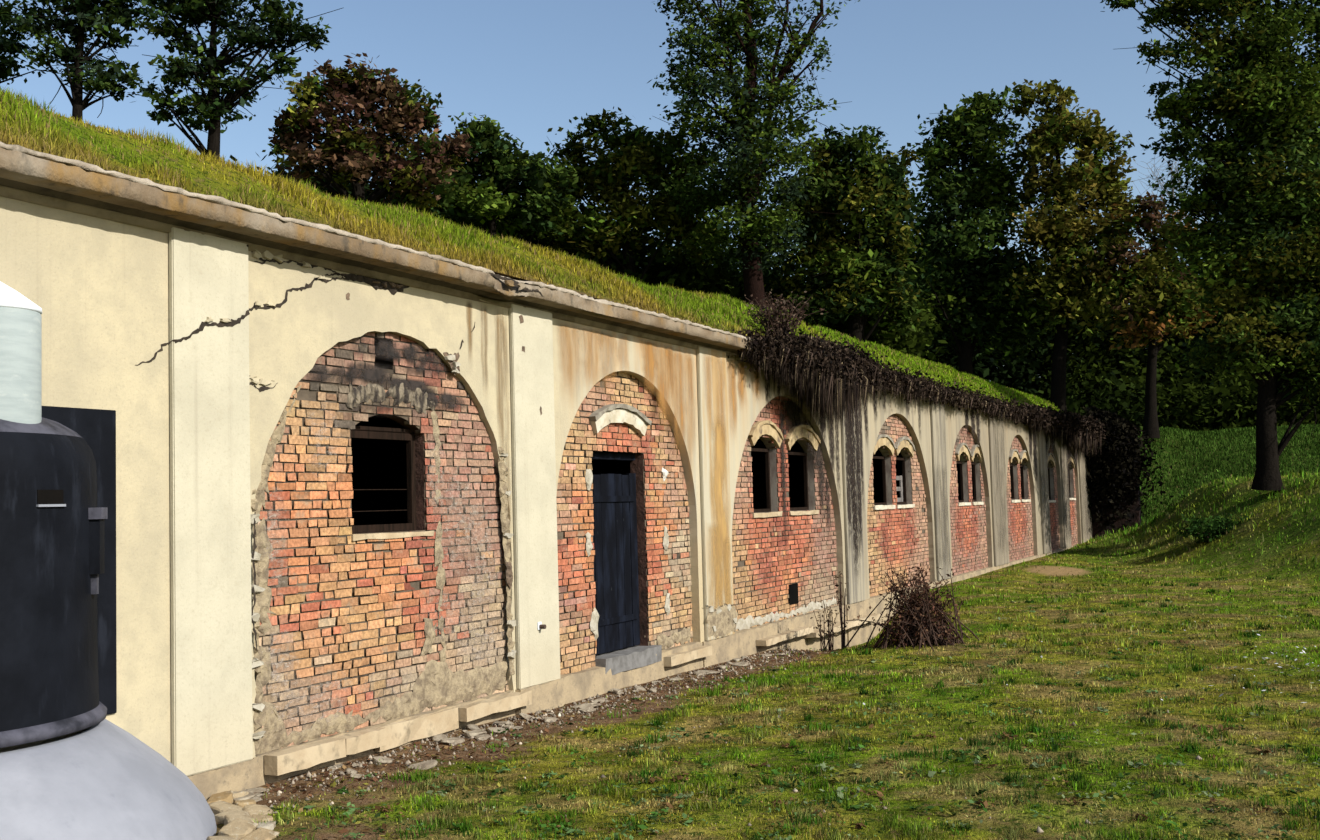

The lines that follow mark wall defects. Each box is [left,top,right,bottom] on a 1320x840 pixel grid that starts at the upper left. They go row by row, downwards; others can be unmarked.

crack [138,245,351,365]
spalling [249,376,277,392]
peeling [346,382,441,504]
spalling [443,324,475,375]
peeling [585,469,593,492]
leakage [754,364,886,556]
spalling [251,386,301,755]
peeling [420,521,446,662]
spalling [496,447,516,680]
peeling [585,532,593,557]
peeling [590,607,599,640]